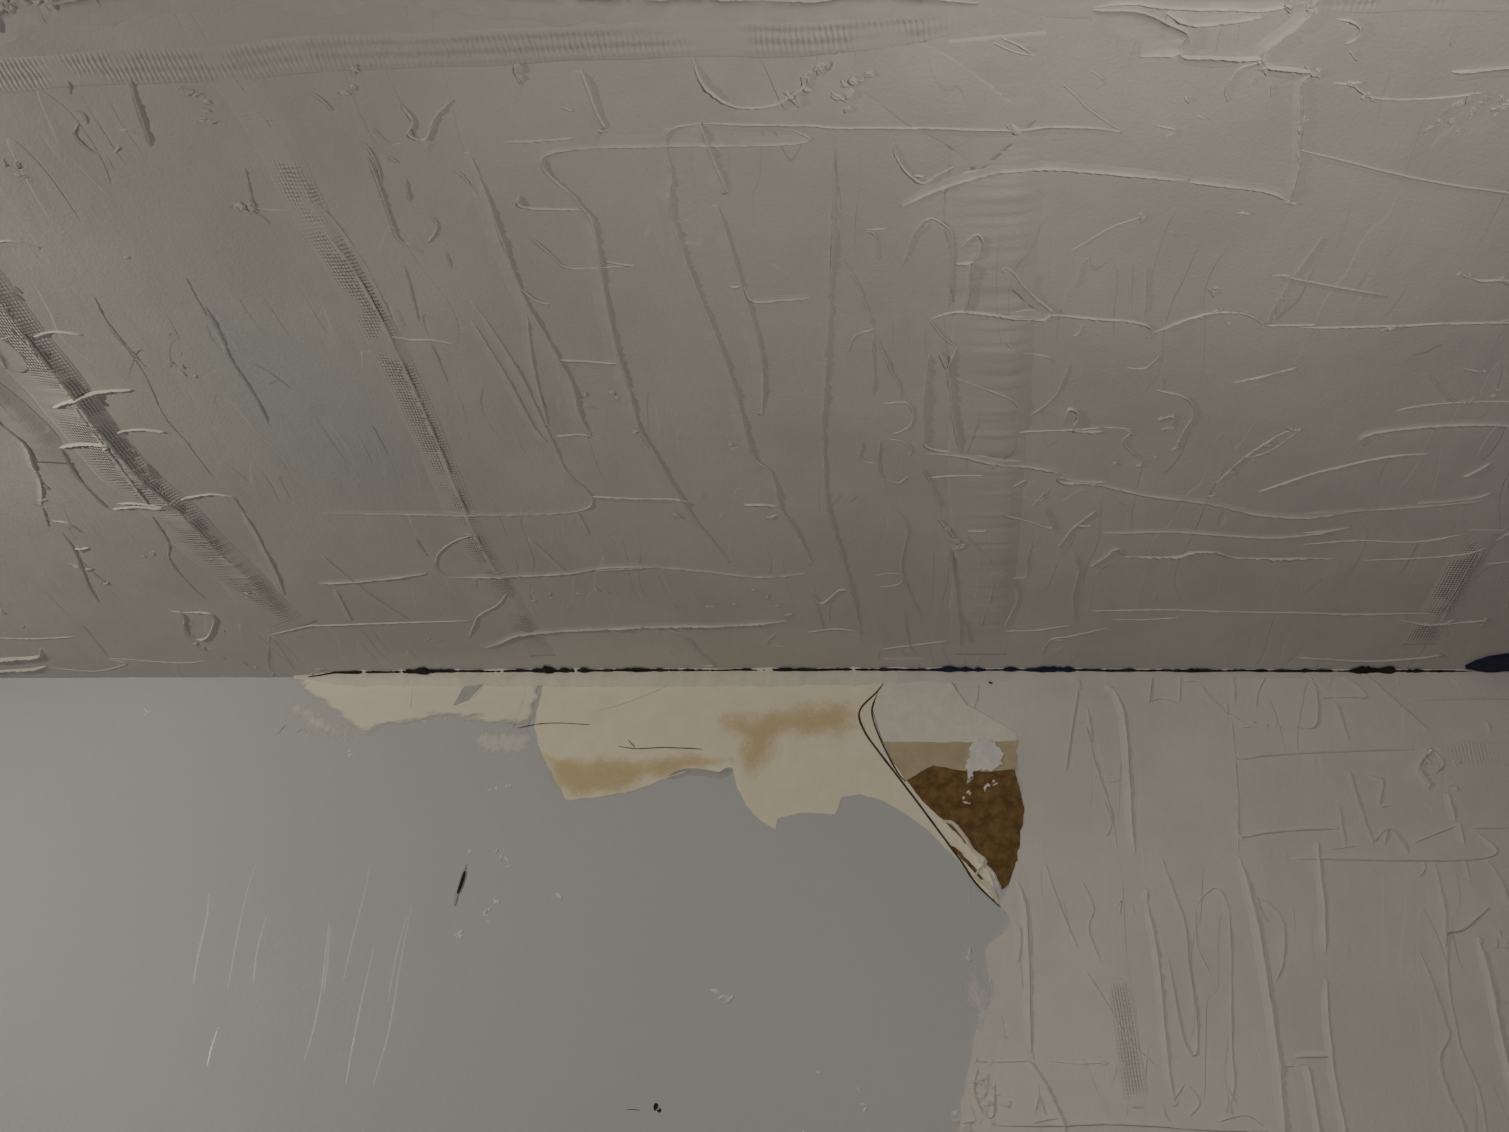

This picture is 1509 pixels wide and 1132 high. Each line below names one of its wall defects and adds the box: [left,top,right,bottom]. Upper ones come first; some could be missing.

peeling [301,679,999,906]